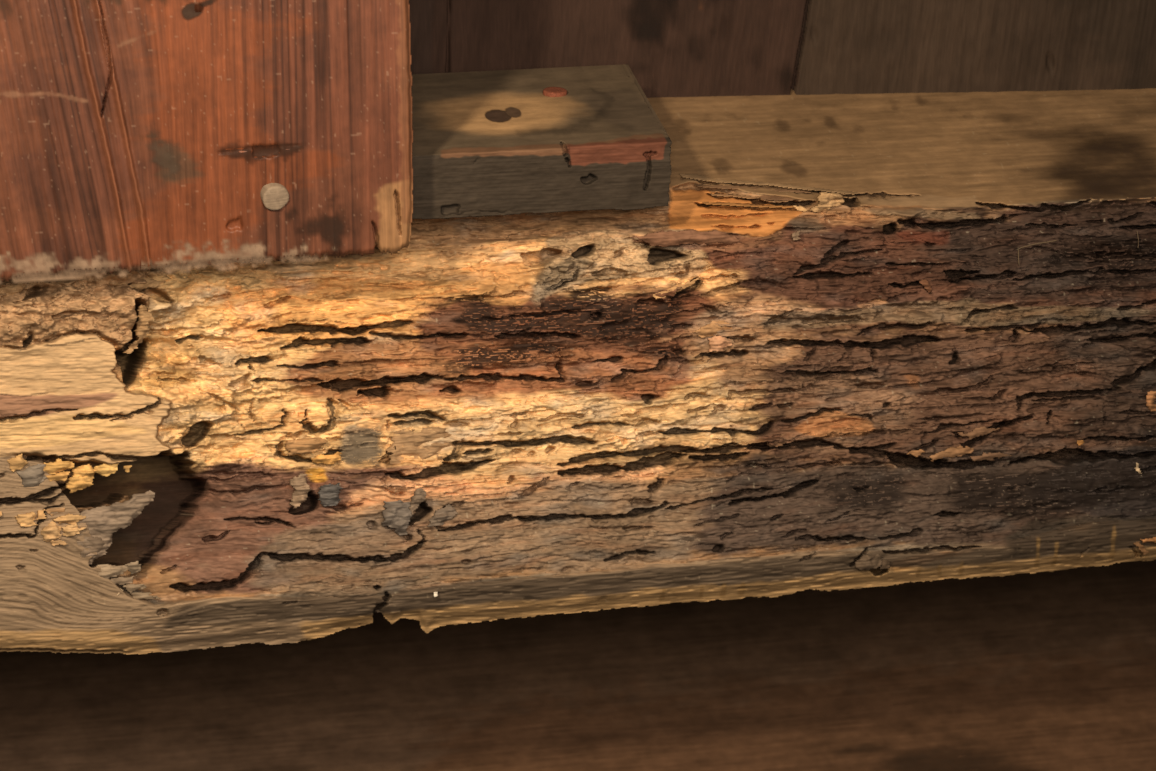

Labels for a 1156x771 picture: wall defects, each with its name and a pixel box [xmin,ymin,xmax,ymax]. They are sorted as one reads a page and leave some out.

crack [98,0,113,118]
water stain [1053,141,1156,211]
water stain [0,253,126,282]
water stain [141,241,312,273]
water stain [308,216,344,250]
crack [371,191,402,248]
crack [695,191,1156,230]
crack [0,400,161,422]
spalling [0,299,210,600]
crack [169,241,1156,610]
crack [0,452,152,538]